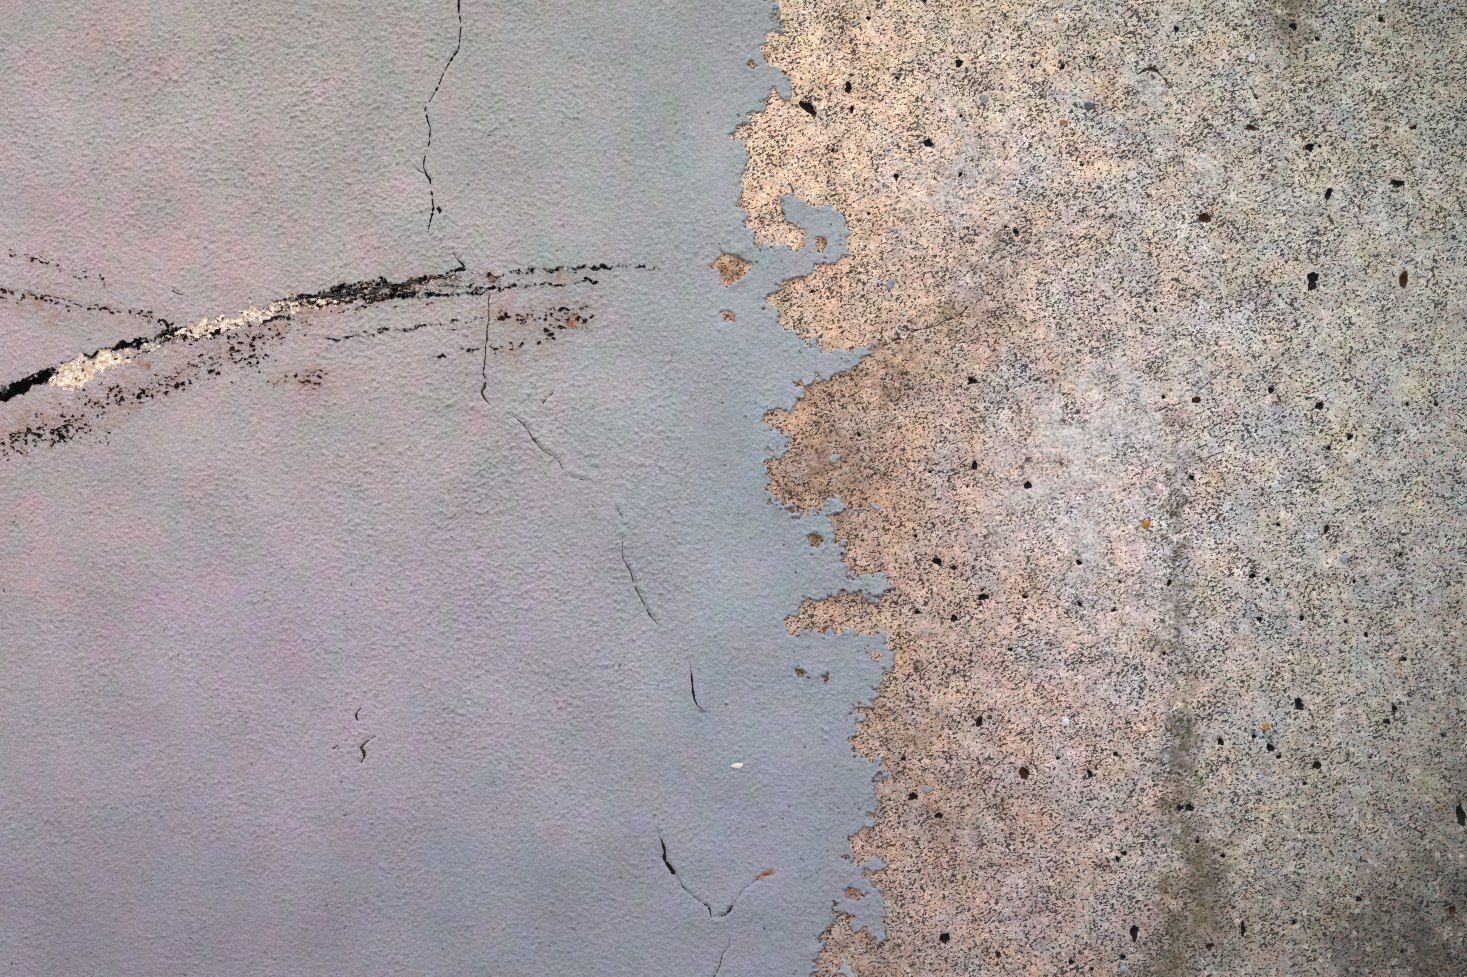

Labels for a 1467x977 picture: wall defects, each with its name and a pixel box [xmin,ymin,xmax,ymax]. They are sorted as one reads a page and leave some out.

crack [0,249,183,322]
crack [417,0,582,480]
peeling [710,0,1467,977]
crack [657,830,770,977]